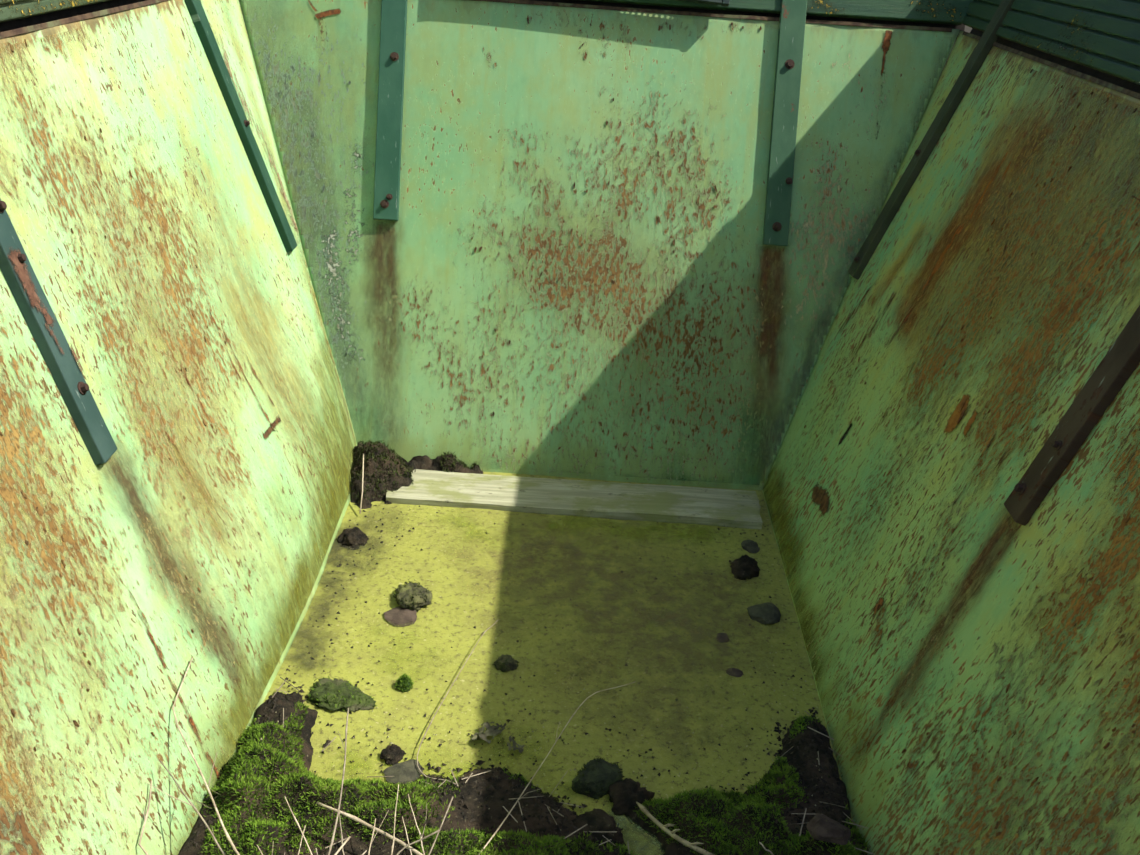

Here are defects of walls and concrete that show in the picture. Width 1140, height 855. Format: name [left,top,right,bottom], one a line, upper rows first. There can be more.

rust [881,30,892,86]
rust [217,34,299,233]
rust [8,249,83,371]
rust [210,312,274,422]
water stain [371,220,395,371]
rust [944,395,977,437]
rust [130,592,219,779]
rust [0,802,44,855]